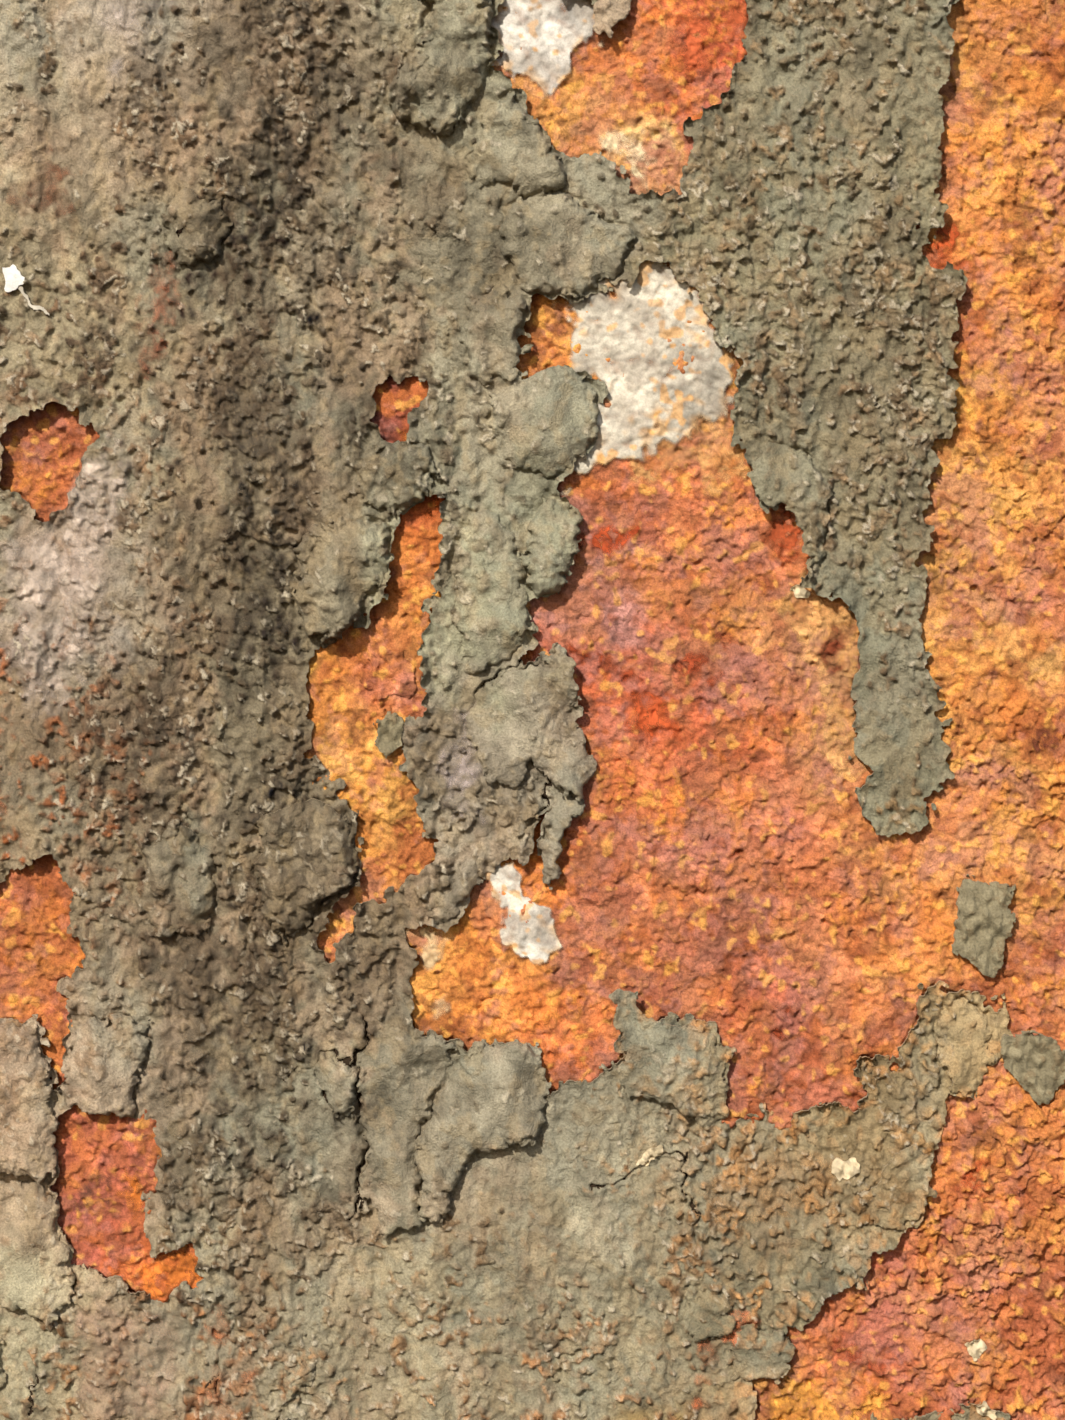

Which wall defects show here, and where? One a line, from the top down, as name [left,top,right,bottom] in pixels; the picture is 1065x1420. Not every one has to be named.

corrosion [927,224,960,256]
peeling [0,401,100,522]
corrosion [578,525,640,553]
corrosion [762,510,801,563]
peeling [303,494,444,963]
corrosion [568,644,680,738]
peeling [356,0,1065,1420]
corrosion [820,629,844,672]
corrosion [1031,721,1059,752]
peeling [0,854,202,1332]